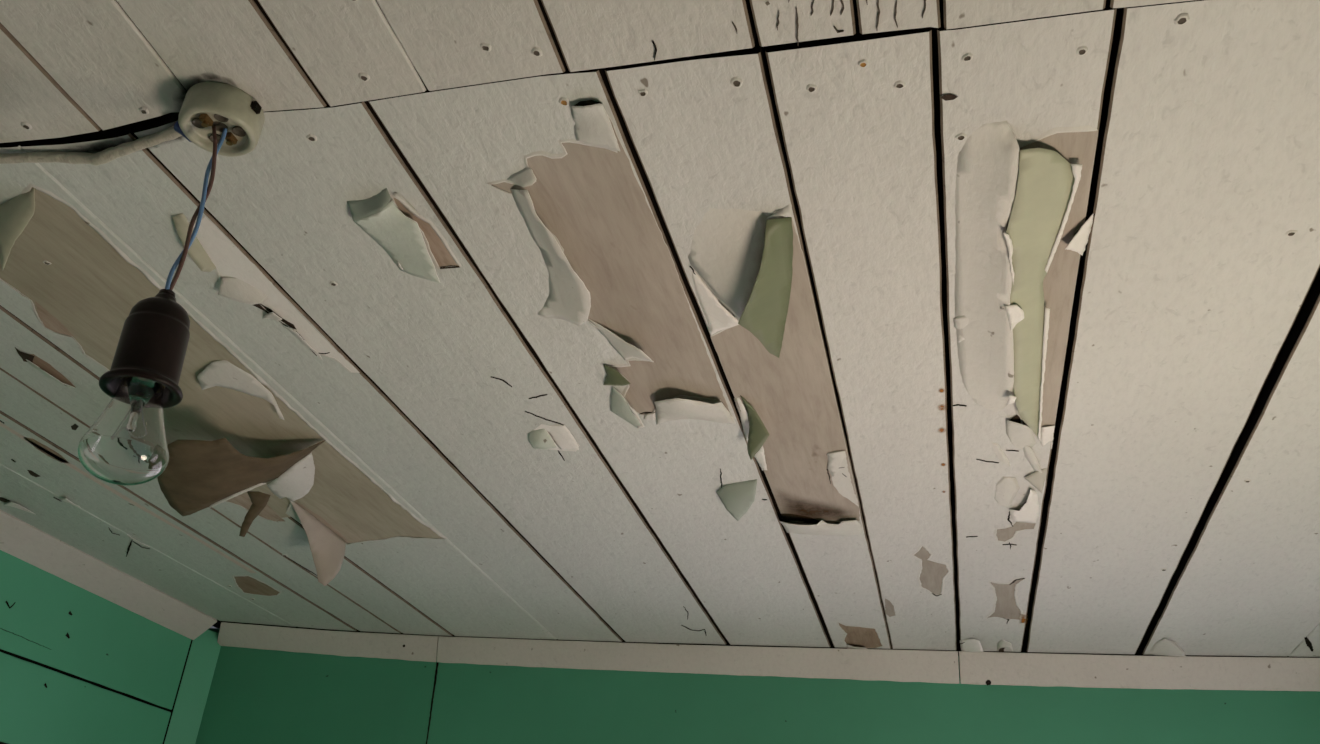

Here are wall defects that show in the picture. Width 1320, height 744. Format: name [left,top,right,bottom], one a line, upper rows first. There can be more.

crack [765,0,926,46]
peeling [0,183,163,371]
peeling [172,213,360,373]
peeling [347,188,461,283]
peeling [487,100,862,536]
peeling [953,120,1098,452]
peeling [0,300,448,596]
peeling [836,621,884,649]
peeling [911,544,951,596]
peeling [994,521,1038,550]